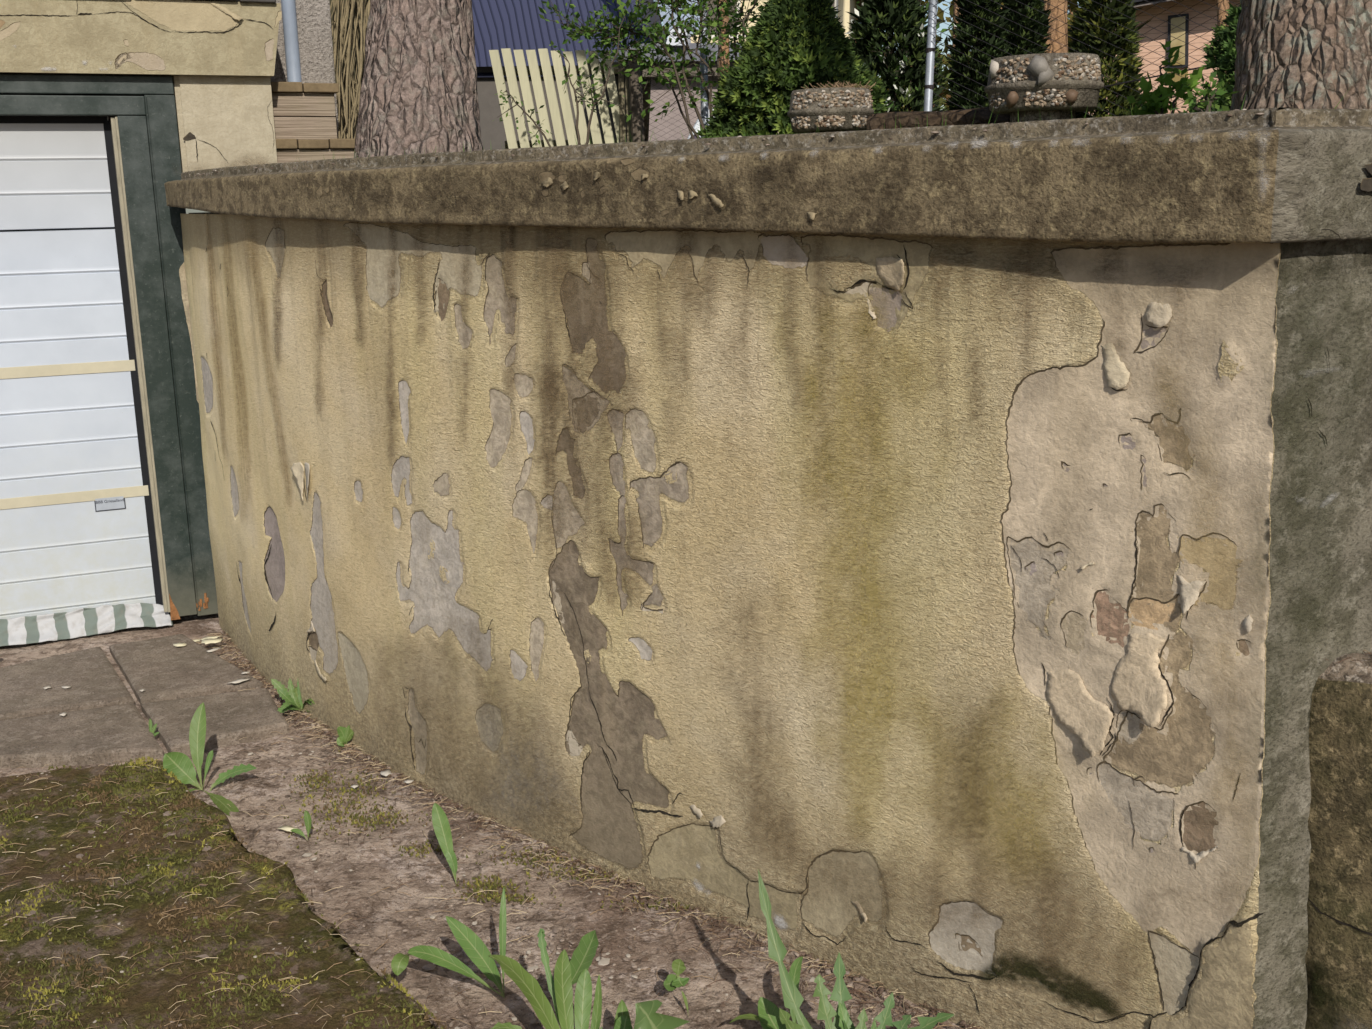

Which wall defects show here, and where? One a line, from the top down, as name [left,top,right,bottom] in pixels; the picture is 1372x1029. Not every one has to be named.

peeling [343,222,553,553]
damp [542,232,631,533]
peeling [263,506,285,602]
peeling [291,462,369,714]
peeling [391,380,493,671]
peeling [510,189,933,945]
peeling [1000,243,1280,1015]
crack [885,922,980,1015]
spalling [928,901,1003,980]
crack [1044,913,1264,1029]
crack [1308,899,1372,950]